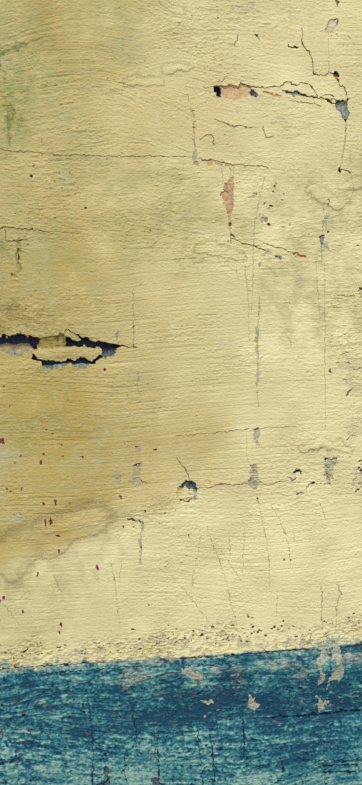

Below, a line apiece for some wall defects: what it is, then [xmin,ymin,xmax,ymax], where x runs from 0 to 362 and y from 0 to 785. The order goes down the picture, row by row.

crack [288,28,329,76]
spalling [203,71,350,122]
crack [338,123,355,193]
spalling [0,292,137,369]
spalling [156,615,312,644]
peeling [182,668,206,682]
peeling [230,634,361,690]
peeling [247,694,260,712]